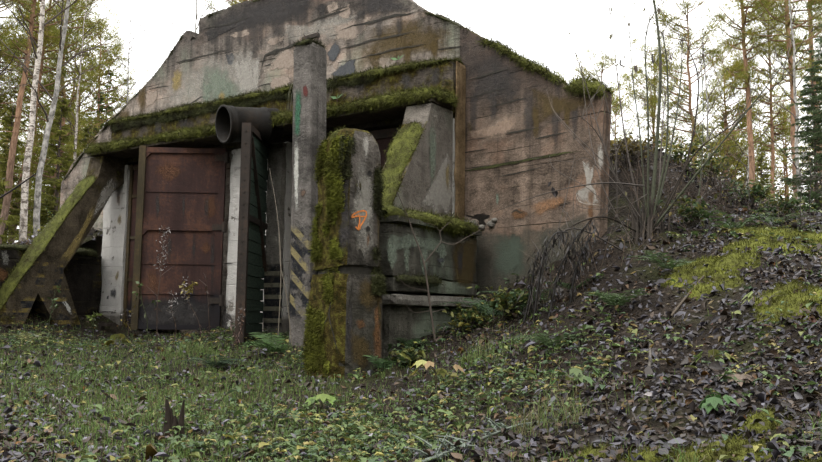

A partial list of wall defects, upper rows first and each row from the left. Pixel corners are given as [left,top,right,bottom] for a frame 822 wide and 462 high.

damp [200,0,343,41]
damp [169,57,259,103]